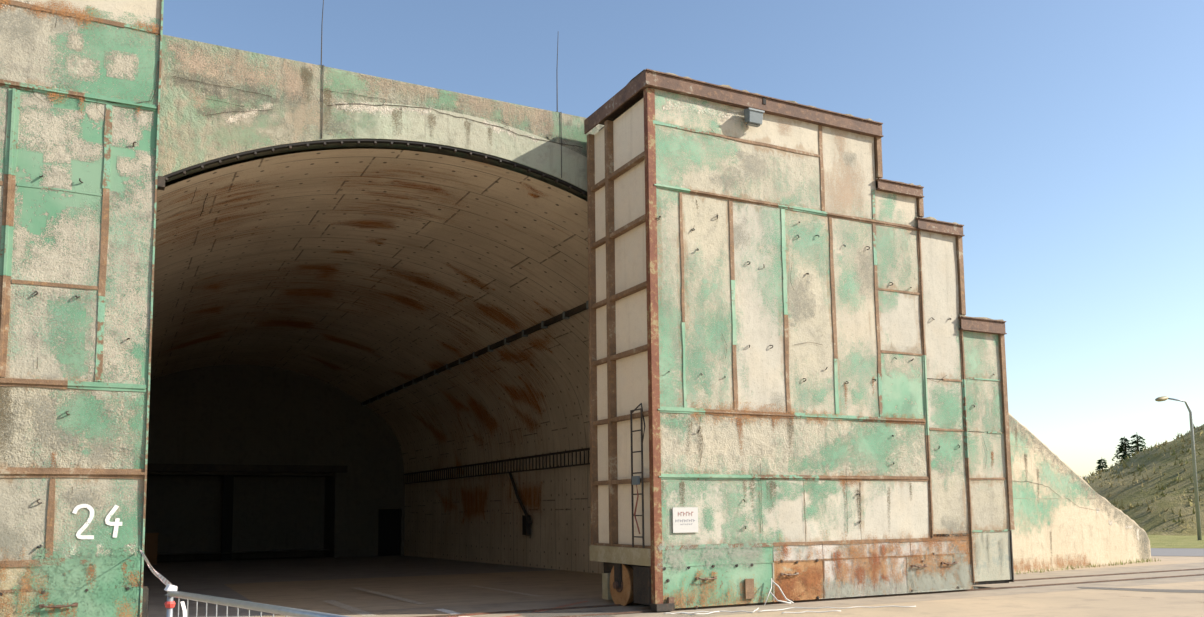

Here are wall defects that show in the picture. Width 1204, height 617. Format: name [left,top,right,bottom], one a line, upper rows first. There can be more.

corrosion [26,0,104,29]
crack [326,90,583,148]
peeling [0,5,587,617]
corrosion [384,262,525,333]
peeling [649,87,1060,574]
corrosion [0,546,77,617]
corrosion [663,527,978,608]